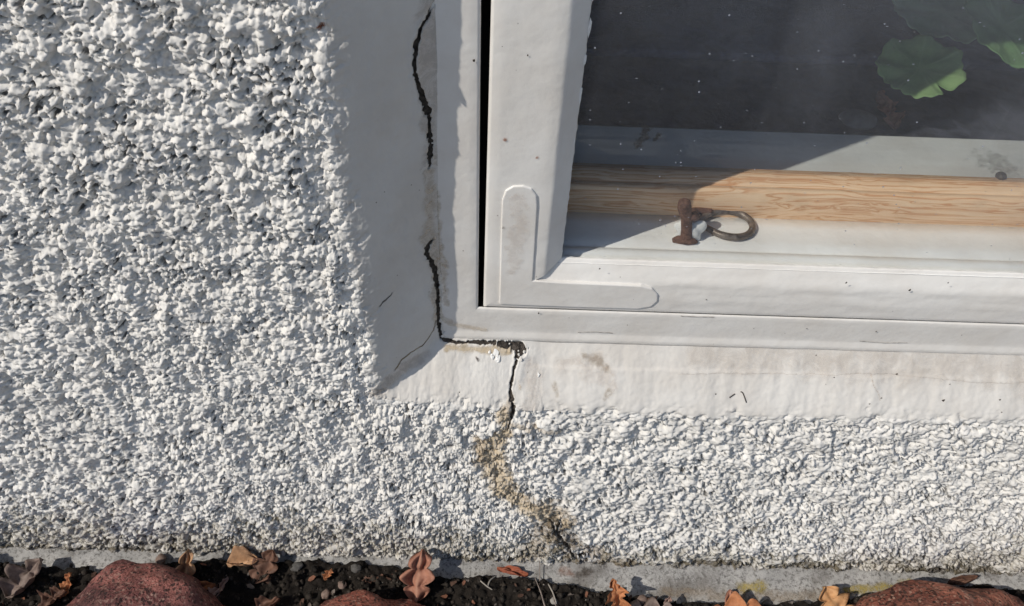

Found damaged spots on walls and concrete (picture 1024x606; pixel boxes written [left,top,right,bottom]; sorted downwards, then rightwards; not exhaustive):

crack [412,8,433,167]
crack [395,239,522,429]
crack [549,519,589,559]